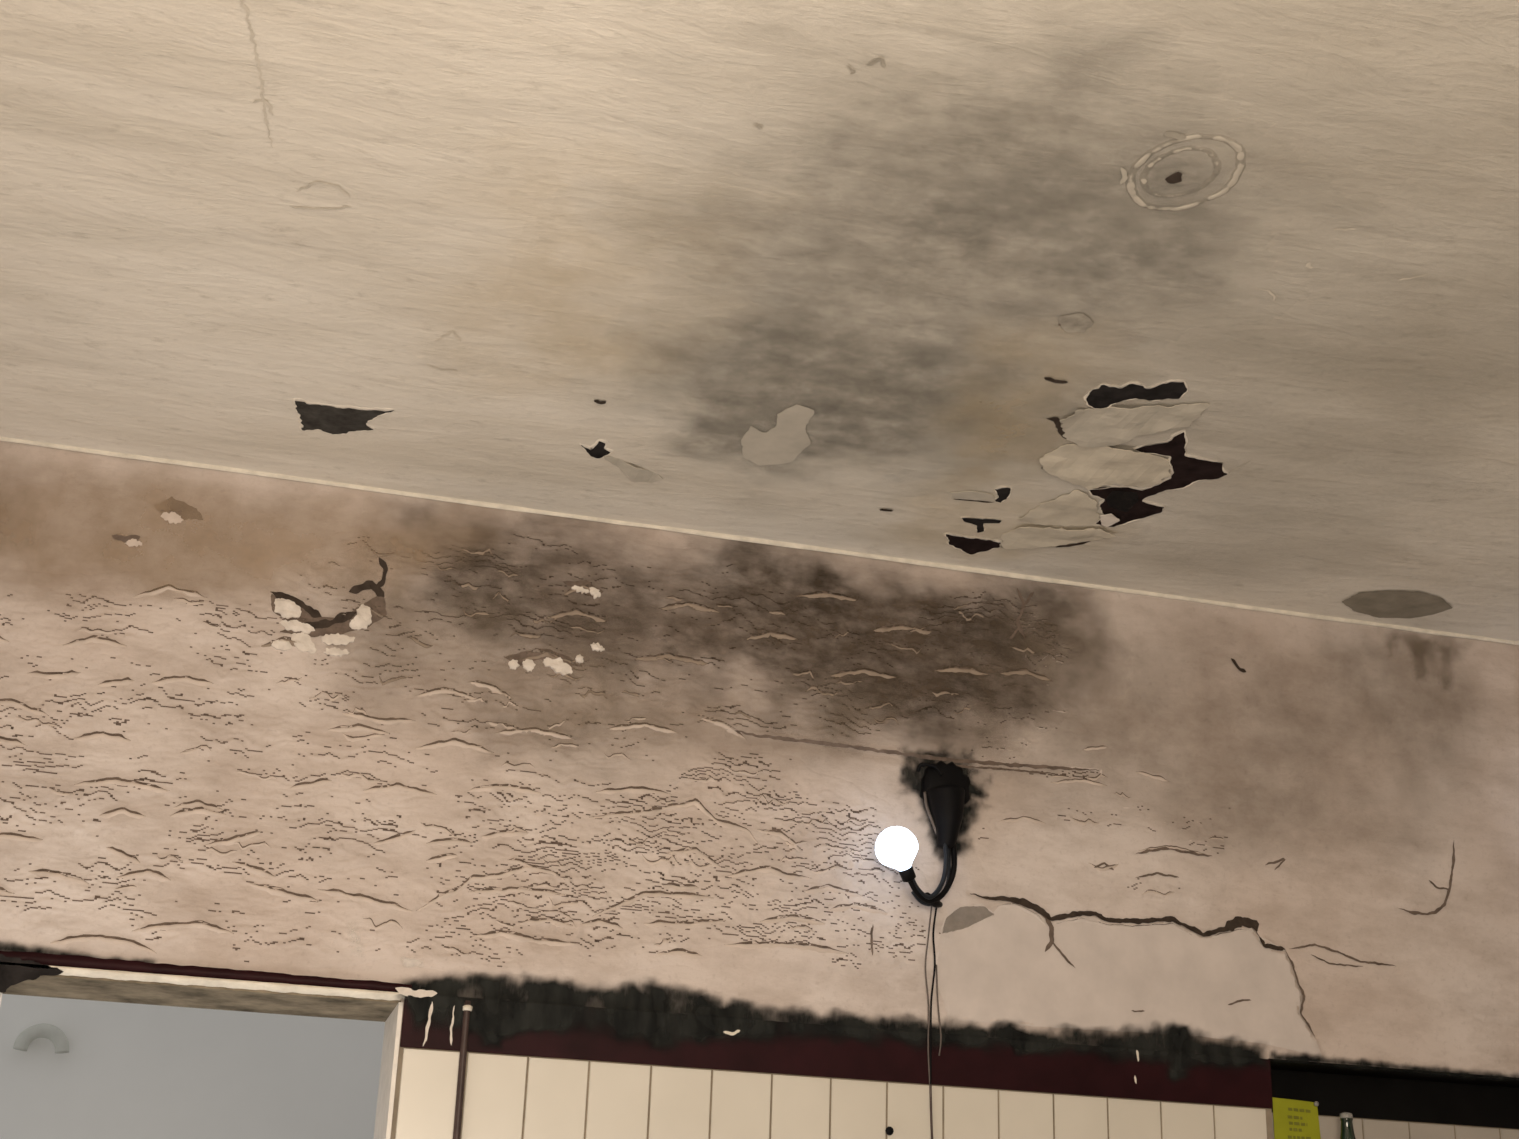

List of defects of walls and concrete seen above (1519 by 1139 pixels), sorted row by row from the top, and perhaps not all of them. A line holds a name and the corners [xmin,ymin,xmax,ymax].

peeling [291,398,395,435]
peeling [943,379,1253,555]
leakage [99,487,325,580]
flaking render [271,557,388,657]
flaking render [503,642,605,676]
leakage [359,527,1083,736]
crack [1094,847,1212,878]
crack [1266,858,1286,870]
crack [1399,842,1455,915]
crack [973,893,1395,1036]
leakage [478,978,504,1047]
leakage [1168,1026,1189,1081]